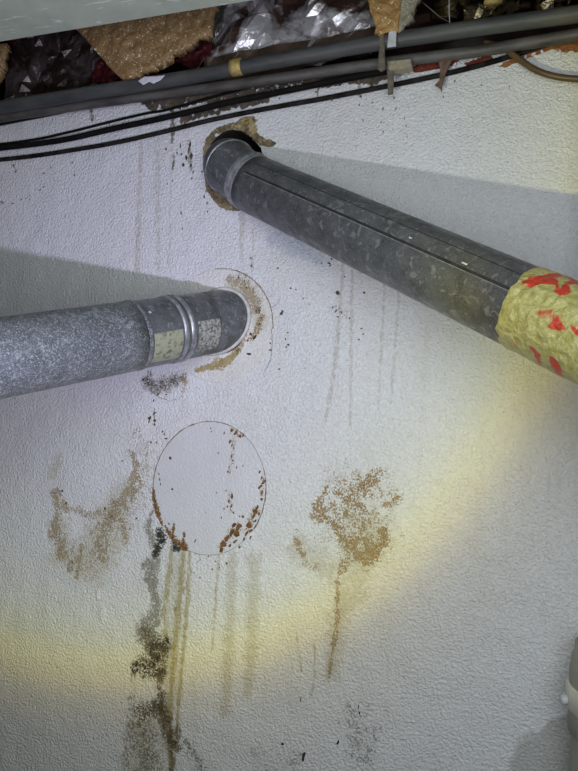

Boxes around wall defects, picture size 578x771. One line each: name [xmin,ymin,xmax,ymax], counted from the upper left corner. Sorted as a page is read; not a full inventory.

corrosion [195,334,247,373]
corrosion [152,473,196,551]
corrosion [216,471,266,553]
leakage [48,429,205,771]